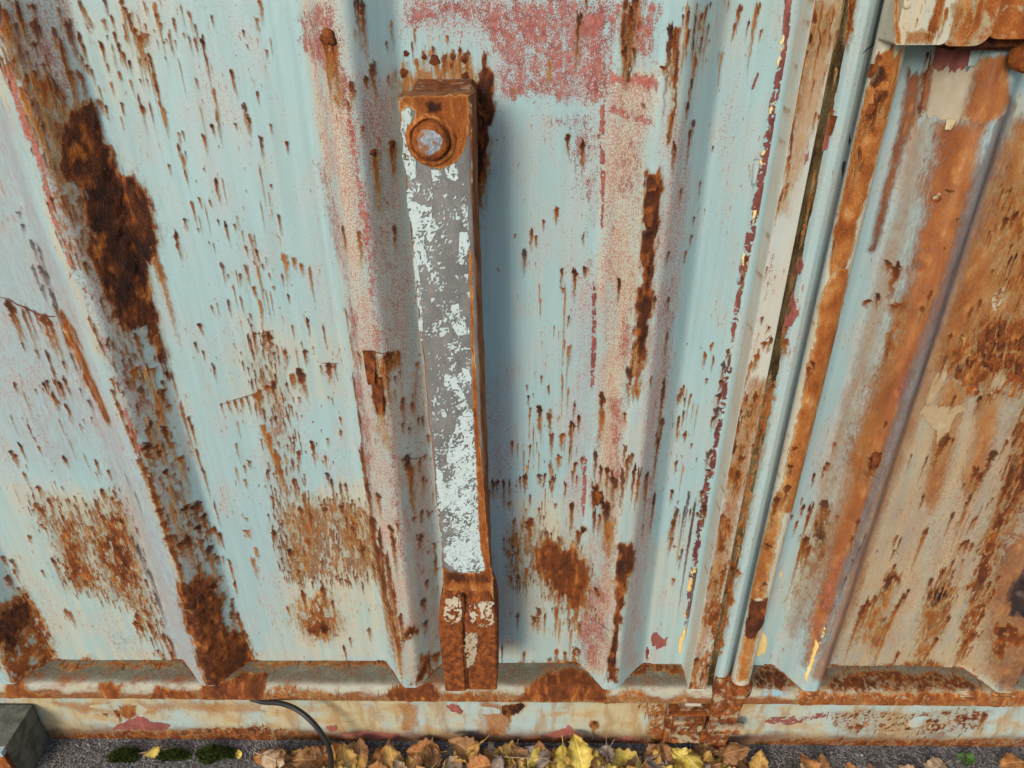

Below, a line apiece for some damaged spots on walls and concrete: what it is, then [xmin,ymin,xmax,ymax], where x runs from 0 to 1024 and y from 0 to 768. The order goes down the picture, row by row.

corrosion [0,0,775,744]
peeling [401,107,485,573]
peeling [403,0,666,237]
peeling [581,280,597,389]
peeling [645,0,792,659]
corrosion [736,0,1024,747]
peeling [925,46,1009,130]